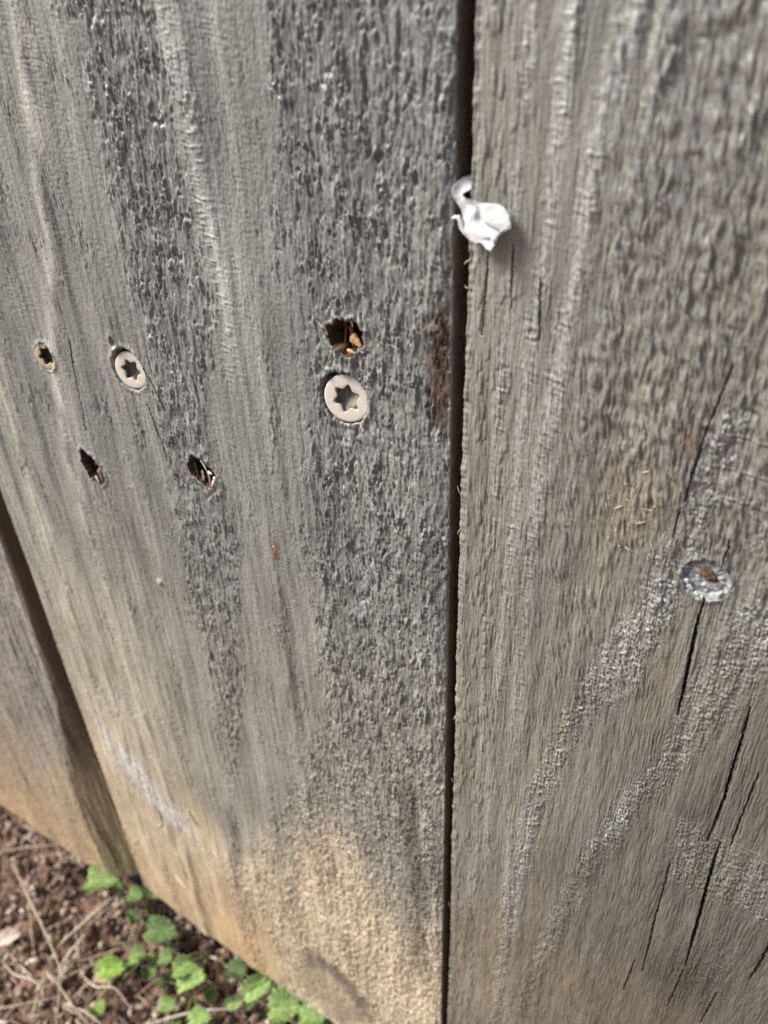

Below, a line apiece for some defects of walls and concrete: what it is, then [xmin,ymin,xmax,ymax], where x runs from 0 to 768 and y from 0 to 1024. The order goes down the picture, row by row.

corrosion [424,313,449,420]
crack [672,369,732,538]
corrosion [682,560,732,599]
crack [678,600,705,713]
crack [666,706,759,1007]
crack [625,866,670,984]
crack [749,946,768,979]